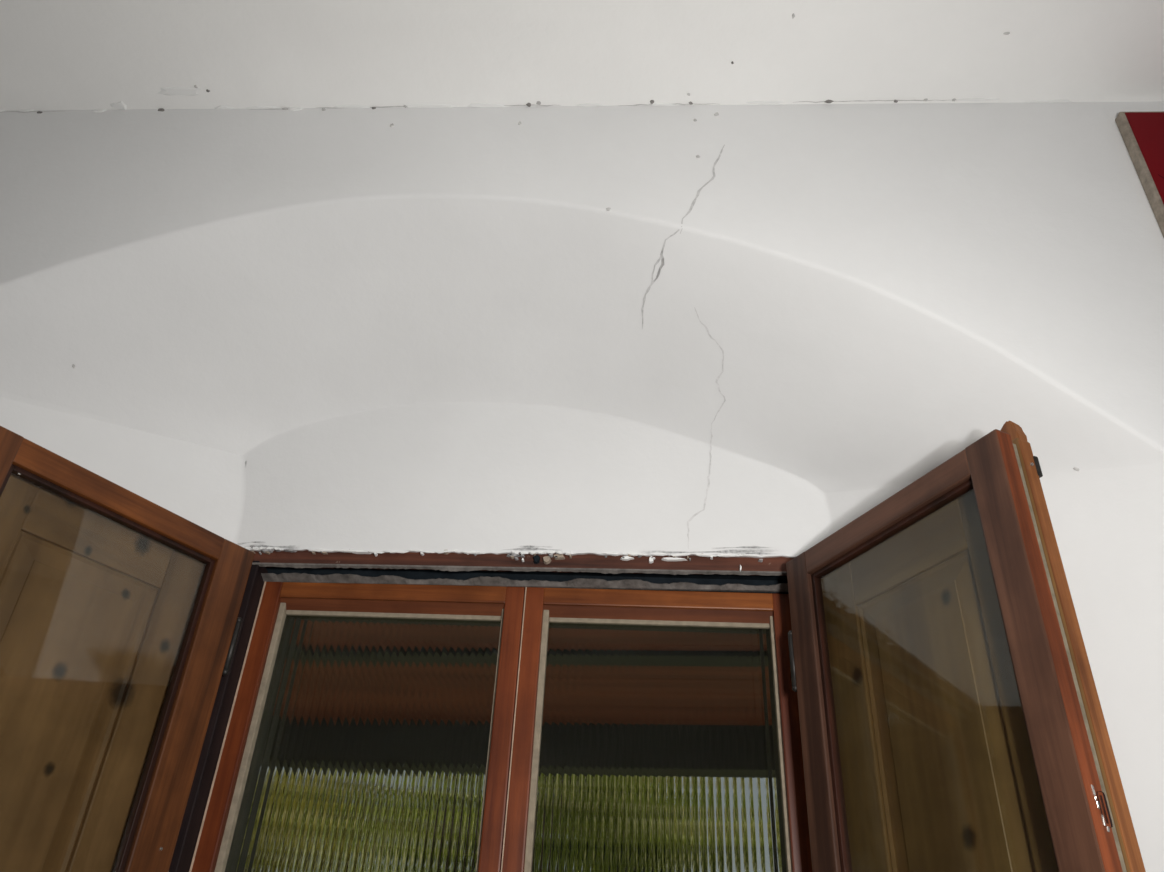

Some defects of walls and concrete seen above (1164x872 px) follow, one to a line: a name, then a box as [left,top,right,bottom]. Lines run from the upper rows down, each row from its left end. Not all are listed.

crack [158,85,719,127]
crack [746,97,999,105]
crack [641,145,725,329]
crack [687,307,726,549]
flaking render [507,550,572,564]
flaking render [601,552,763,572]